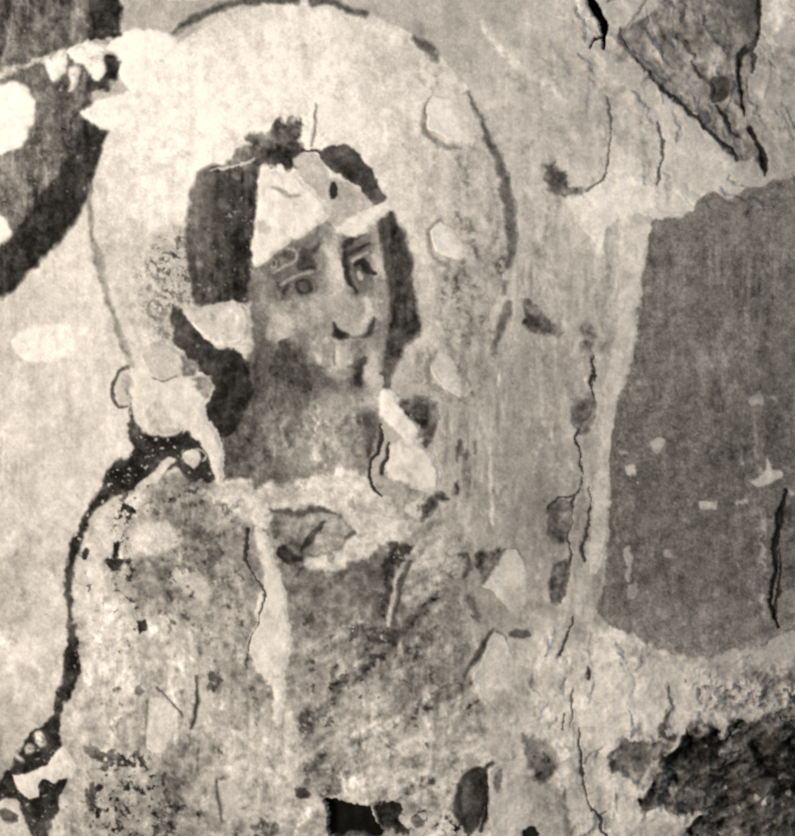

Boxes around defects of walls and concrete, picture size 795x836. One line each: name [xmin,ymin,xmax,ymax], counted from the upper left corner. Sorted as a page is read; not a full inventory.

crack [587,0,611,50]
flaking render [0,80,36,155]
crack [656,121,666,186]
flaking render [110,340,225,485]
flaking render [378,388,442,519]
crack [588,355,597,397]
crack [547,431,592,564]
crack [768,489,788,628]
crack [557,616,574,657]
flaking render [607,663,795,836]
flaking render [324,797,410,836]
flaking render [479,751,540,836]